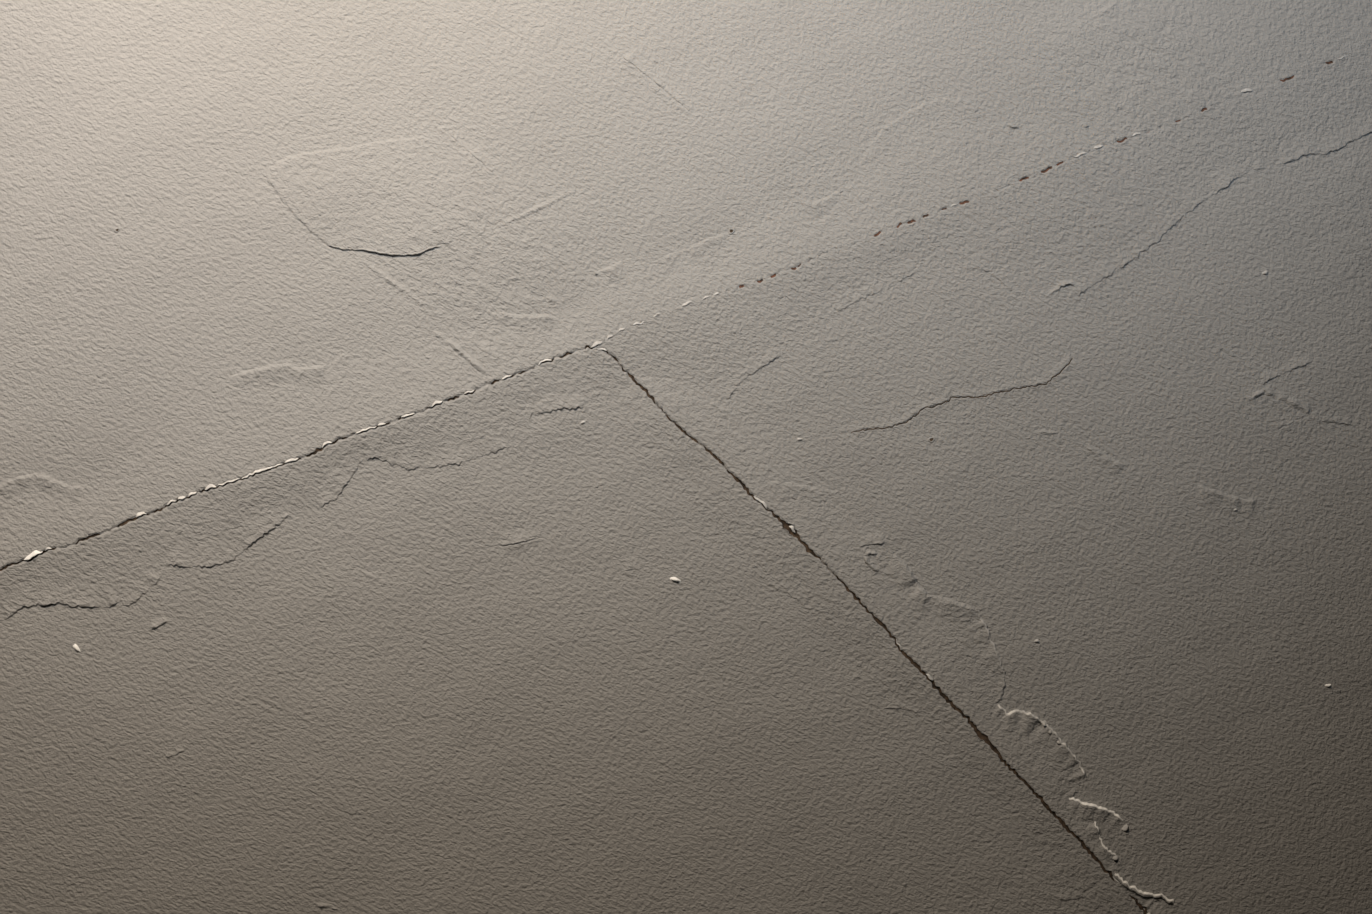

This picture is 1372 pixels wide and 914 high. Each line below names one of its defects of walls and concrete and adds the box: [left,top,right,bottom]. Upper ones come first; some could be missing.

crack [1241,75,1294,92]
crack [1019,108,1207,181]
crack [872,201,969,237]